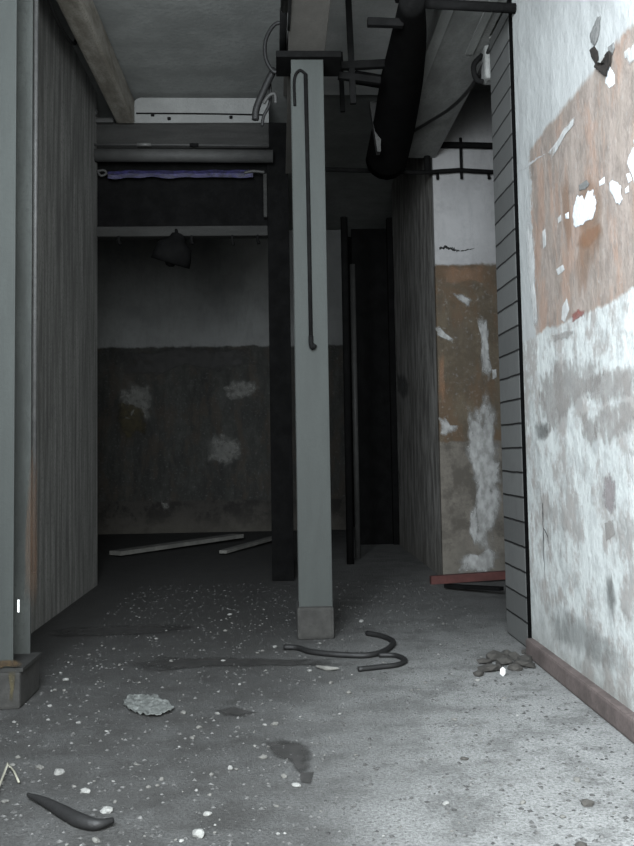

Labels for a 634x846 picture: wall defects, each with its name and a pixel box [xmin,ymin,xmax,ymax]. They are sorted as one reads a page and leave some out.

spalling [589,16,634,88]
peeling [550,119,574,153]
peeling [558,140,634,228]
peeling [527,220,546,322]
peeling [478,320,497,379]
peeling [441,420,457,434]